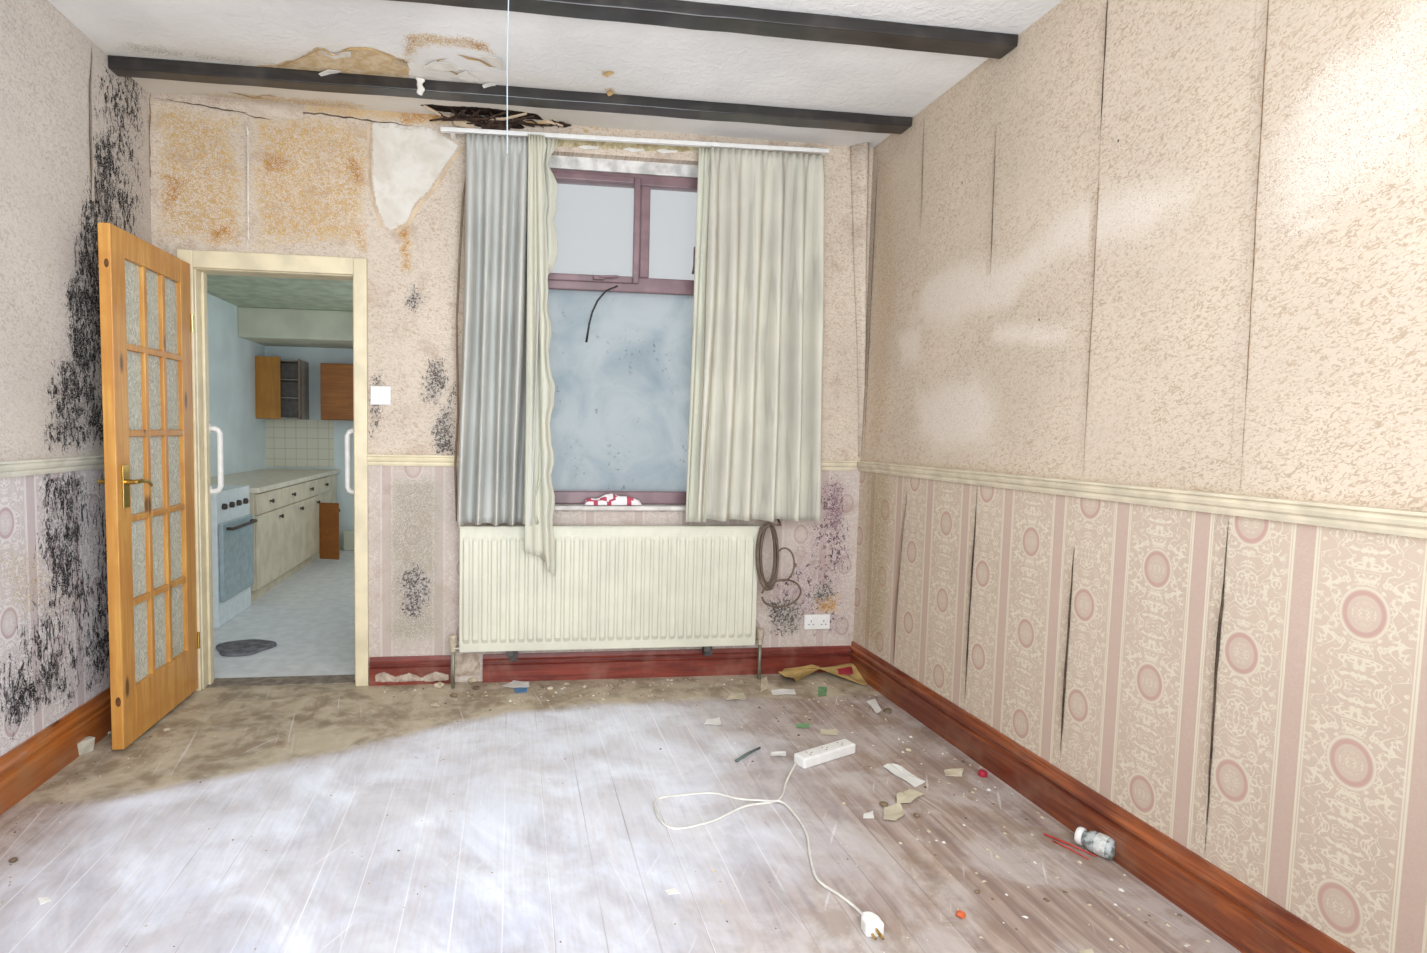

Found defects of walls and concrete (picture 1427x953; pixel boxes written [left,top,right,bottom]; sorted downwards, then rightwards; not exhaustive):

leakage [0,69,453,740]
peeling [256,46,425,96]
peeling [367,122,465,233]
leakage [376,357,481,677]
leakage [764,472,894,655]
crack [960,486,977,702]
leakage [868,155,1209,462]
crack [1053,544,1075,763]
crack [1076,0,1108,475]
crack [1195,0,1269,850]